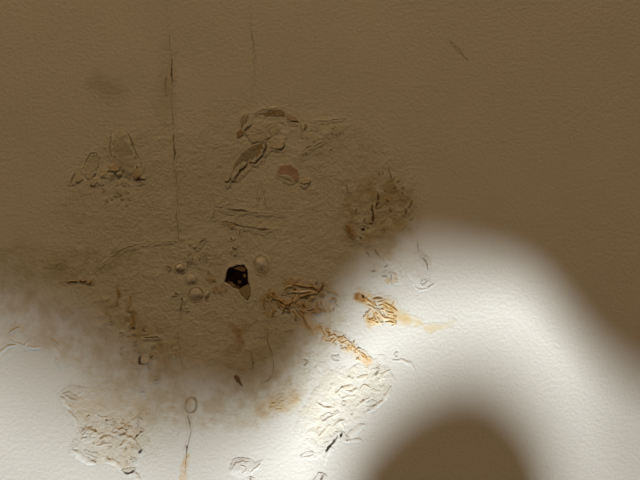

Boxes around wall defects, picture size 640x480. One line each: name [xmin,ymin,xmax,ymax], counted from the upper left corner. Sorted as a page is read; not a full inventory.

peeling [66,128,149,207]
flaking render [224,140,271,188]
peeling [94,290,186,383]
damp [0,67,432,471]
corrosion [258,275,373,365]
corrosion [350,287,457,335]
peeling [59,385,151,480]
crack [183,415,193,476]
peeling [294,352,416,480]